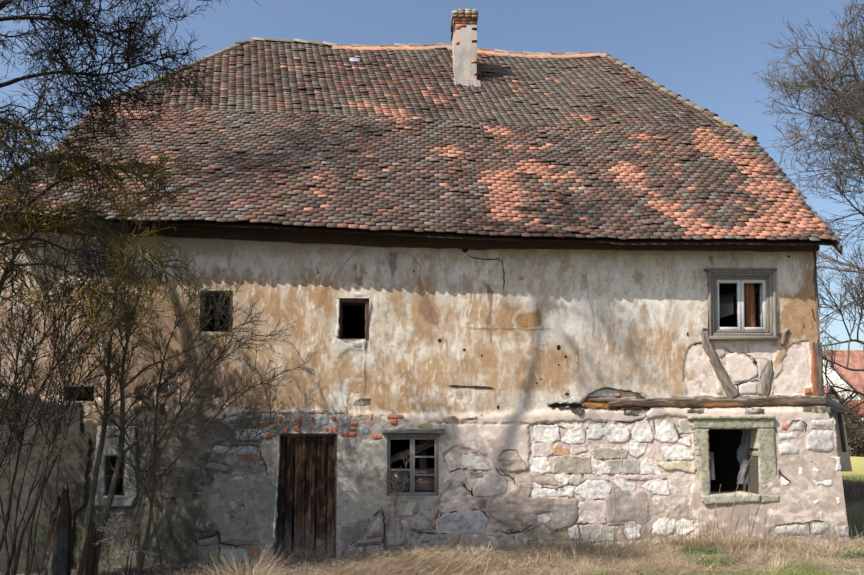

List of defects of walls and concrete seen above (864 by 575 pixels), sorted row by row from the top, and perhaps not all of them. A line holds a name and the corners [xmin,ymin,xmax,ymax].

crack [462,249,505,289]
flaking render [684,339,812,396]
crack [195,440,267,562]
flaking render [132,378,410,537]
flaking render [342,388,710,558]
flaking render [768,500,849,540]
flaking render [777,406,842,486]